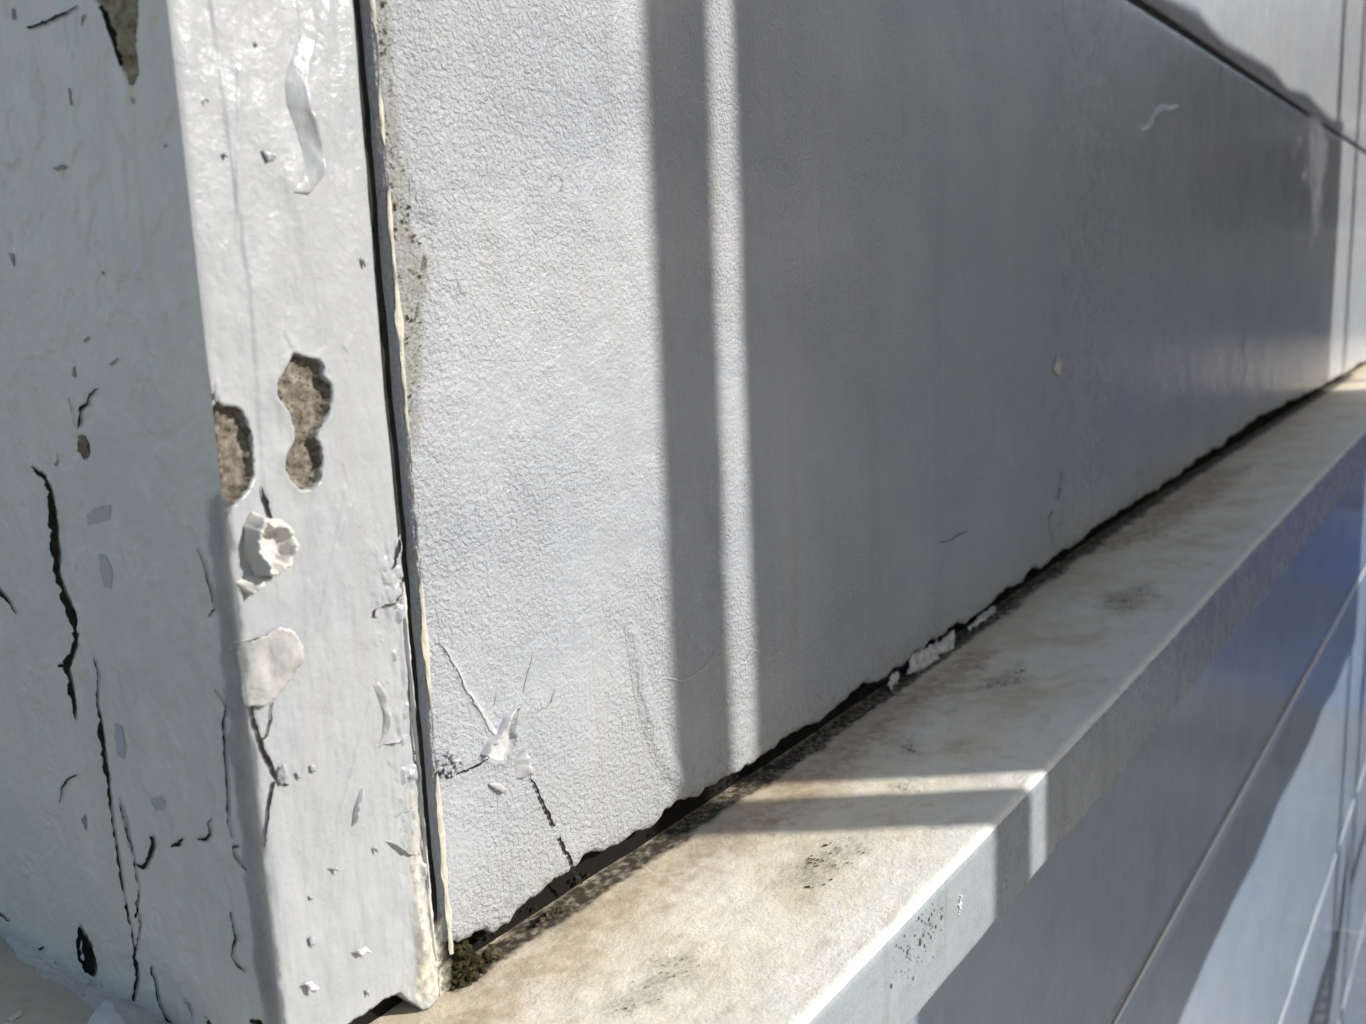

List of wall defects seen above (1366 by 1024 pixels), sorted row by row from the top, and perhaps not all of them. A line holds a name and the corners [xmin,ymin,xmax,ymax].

peeling [81,0,139,104]
peeling [285,0,328,194]
spalling [213,393,254,516]
spalling [277,354,330,490]
crack [0,591,16,614]
peeling [230,626,304,707]
spalling [887,606,996,690]
crack [31,466,289,1024]
peeling [480,705,533,793]
crack [530,774,583,884]
spalling [76,926,95,977]